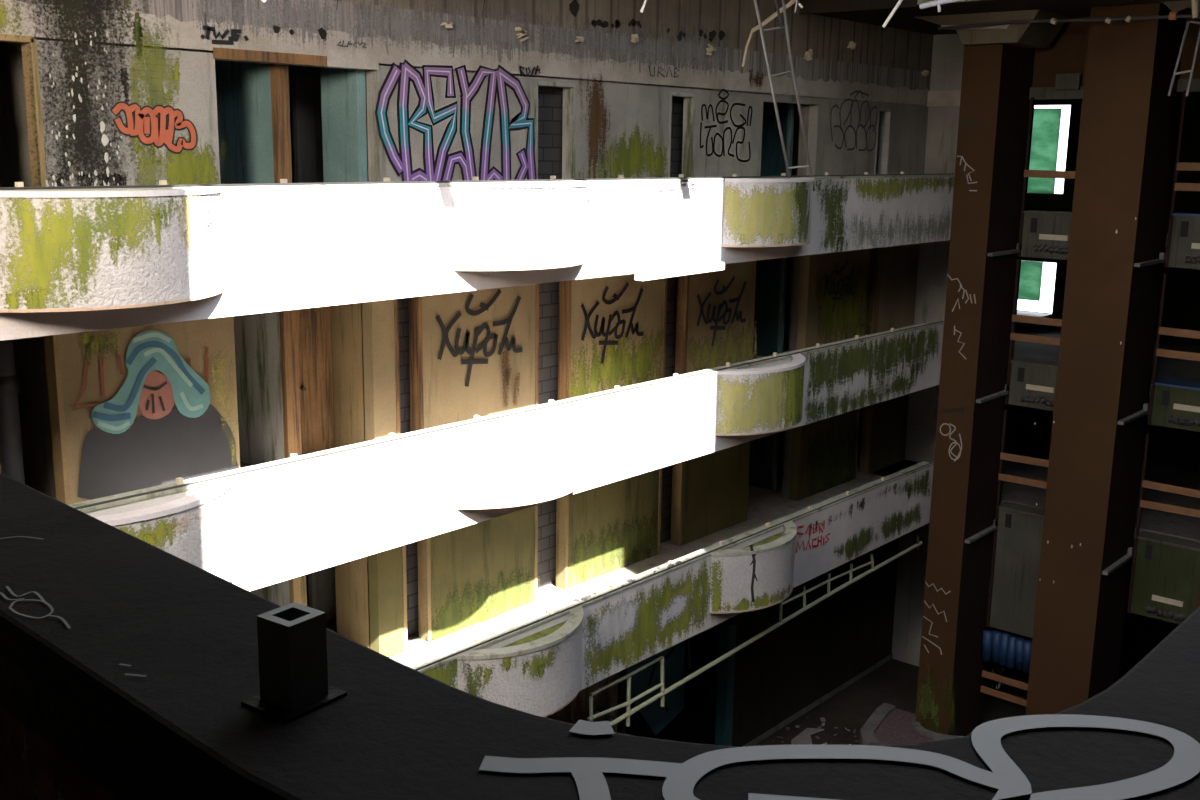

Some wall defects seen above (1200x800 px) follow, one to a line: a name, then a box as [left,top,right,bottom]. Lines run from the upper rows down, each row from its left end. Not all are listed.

damp [13,0,154,187]
damp [154,213,162,246]
damp [186,202,195,248]
damp [778,182,811,244]
damp [824,193,950,252]
damp [6,289,47,309]
crack [750,545,758,602]
damp [462,657,545,698]
damp [548,682,620,732]